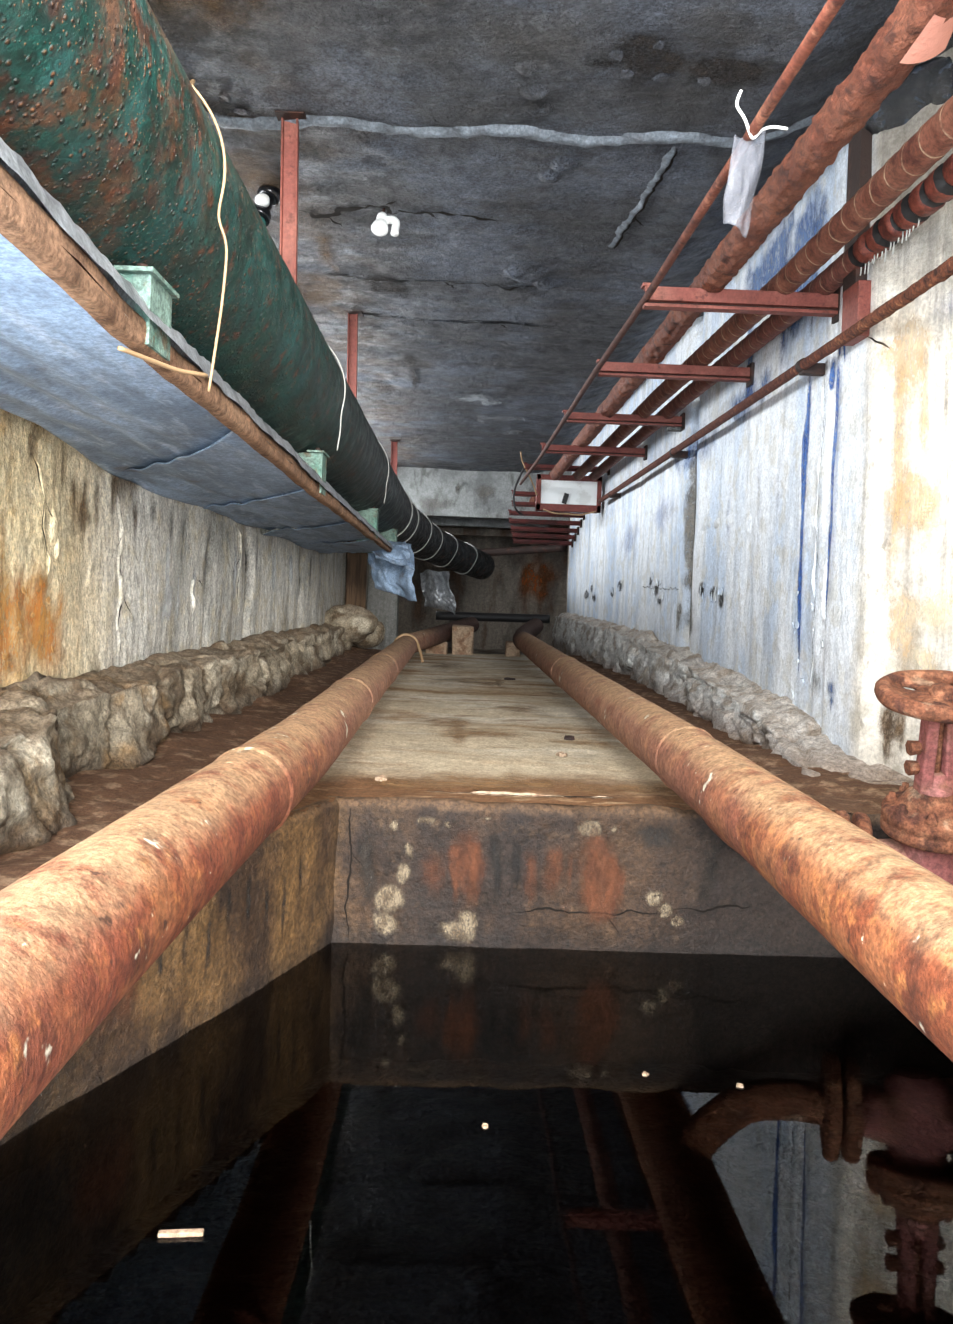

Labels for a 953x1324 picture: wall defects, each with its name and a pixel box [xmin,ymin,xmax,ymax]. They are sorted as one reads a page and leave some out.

rust [881,321,931,543]
rust [0,578,62,674]